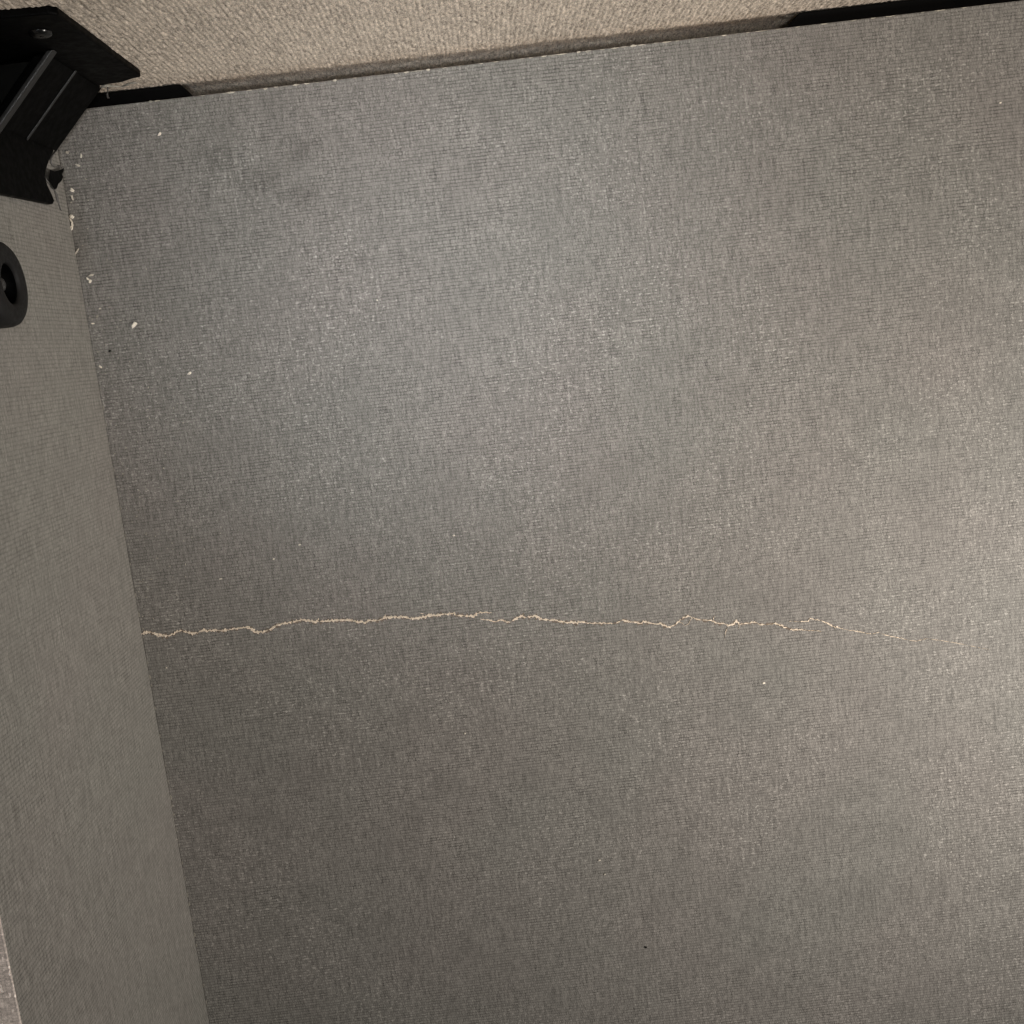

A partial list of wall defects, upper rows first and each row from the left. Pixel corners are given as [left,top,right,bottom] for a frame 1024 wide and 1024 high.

crack [141,611,985,649]